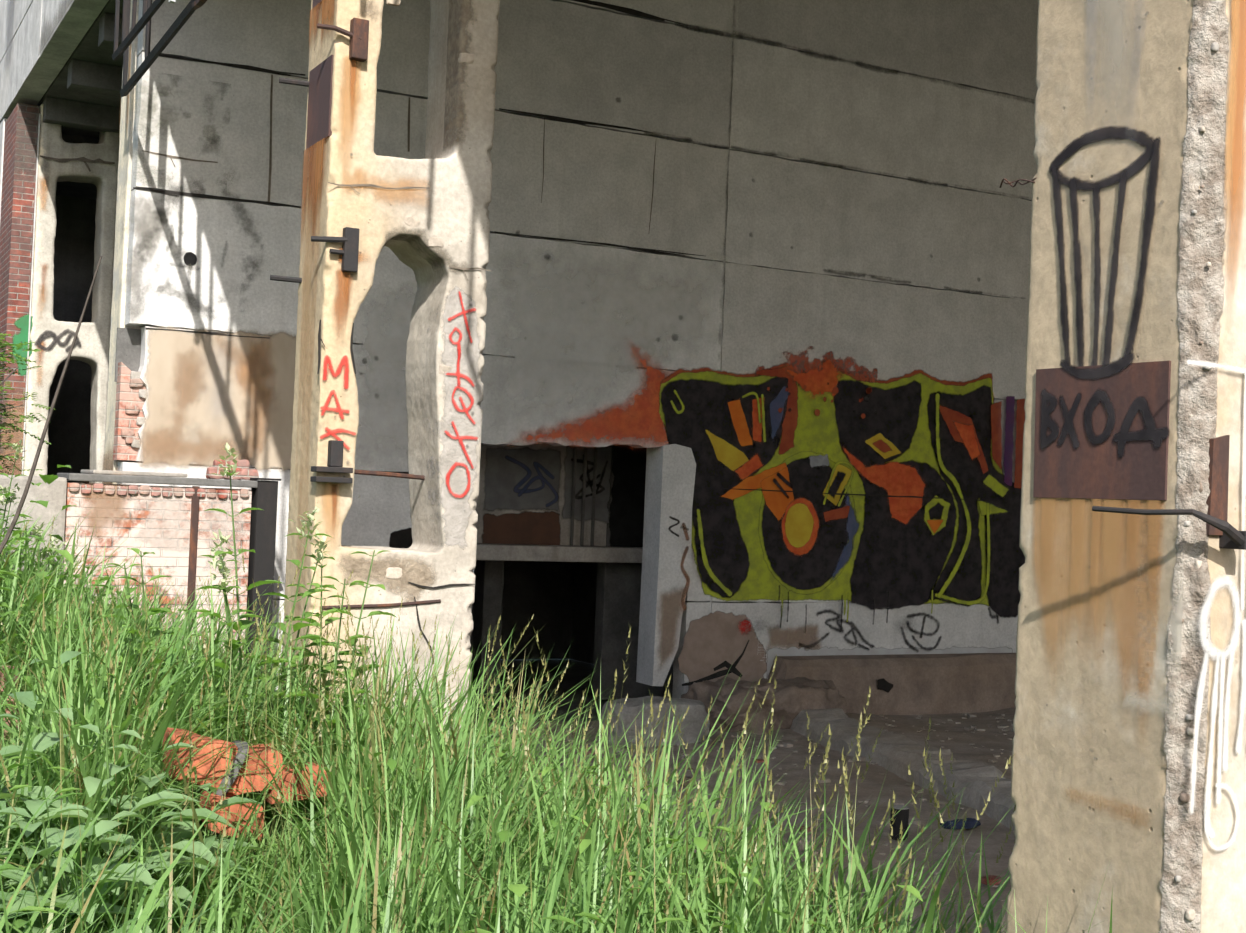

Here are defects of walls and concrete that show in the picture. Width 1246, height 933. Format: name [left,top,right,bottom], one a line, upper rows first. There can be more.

corrosion [309,0,334,40]
corrosion [343,57,359,133]
corrosion [1227,0,1246,225]
corrosion [302,138,324,223]
damp [127,207,164,299]
corrosion [335,249,361,322]
spalling [113,327,148,461]
damp [141,328,296,471]
spalling [1159,0,1229,933]
corrosion [1035,497,1161,691]